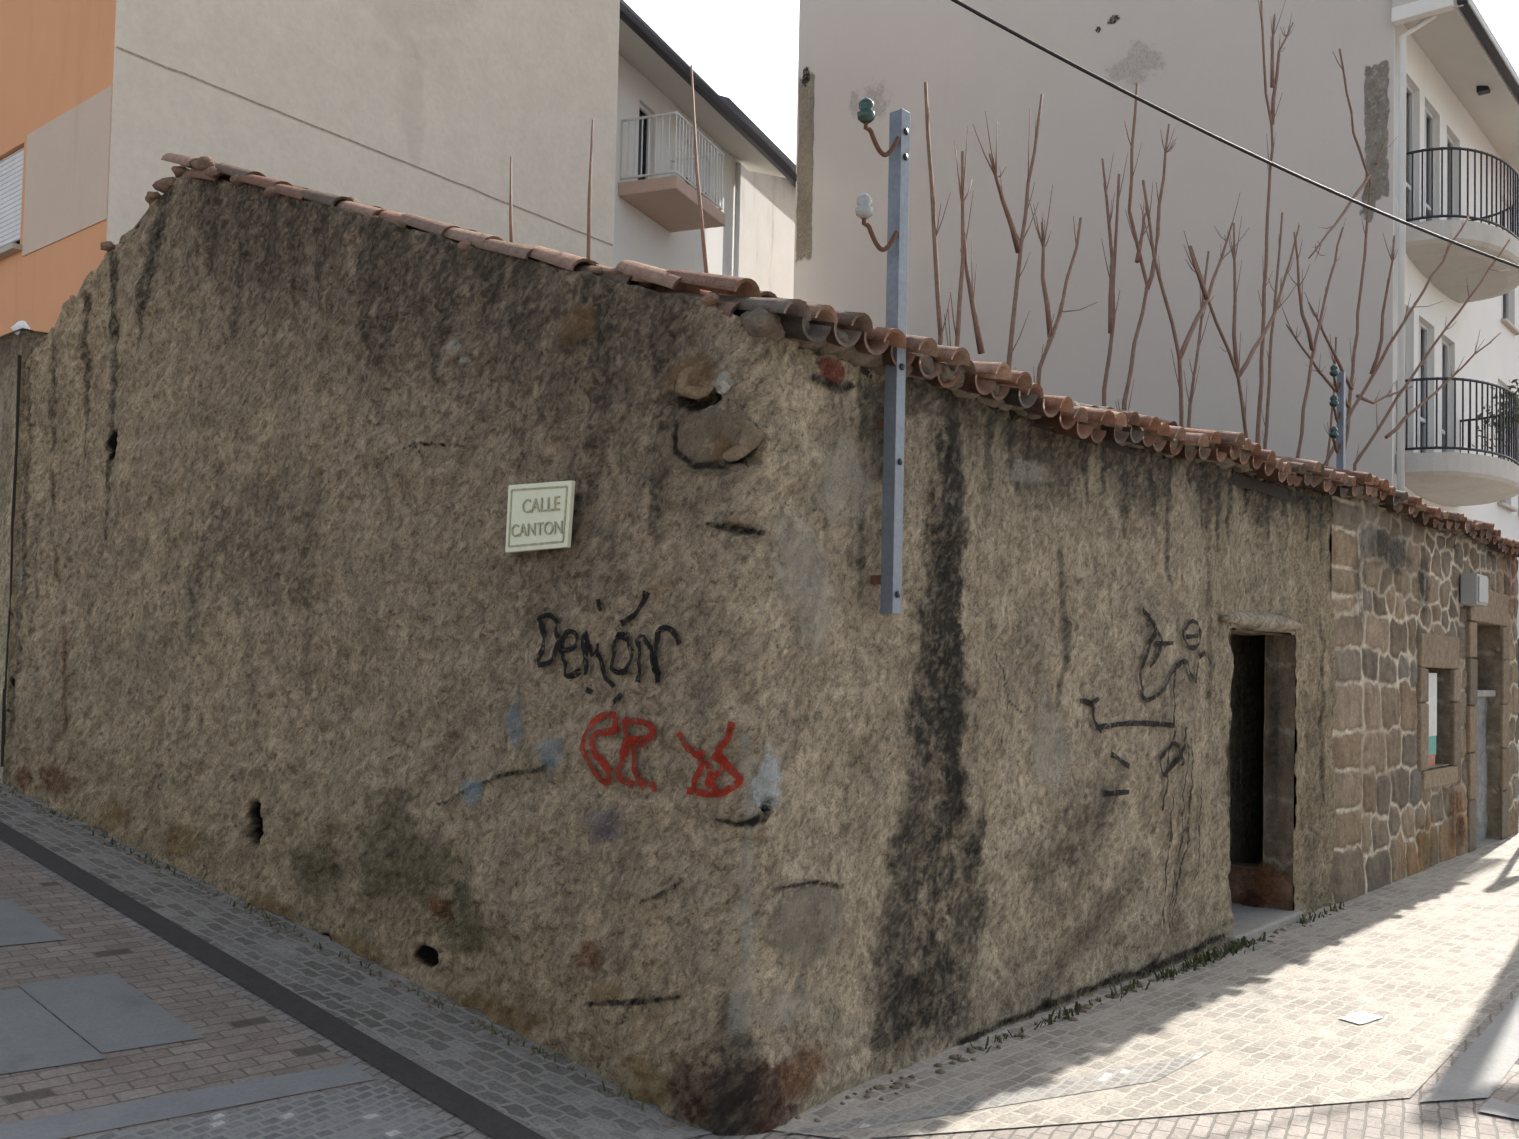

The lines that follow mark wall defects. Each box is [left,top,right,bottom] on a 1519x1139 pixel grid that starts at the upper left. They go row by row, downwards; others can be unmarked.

spalling [1360,61,1390,222]
spalling [658,354,768,476]
leakage [858,381,885,606]
leakage [872,377,1334,1049]